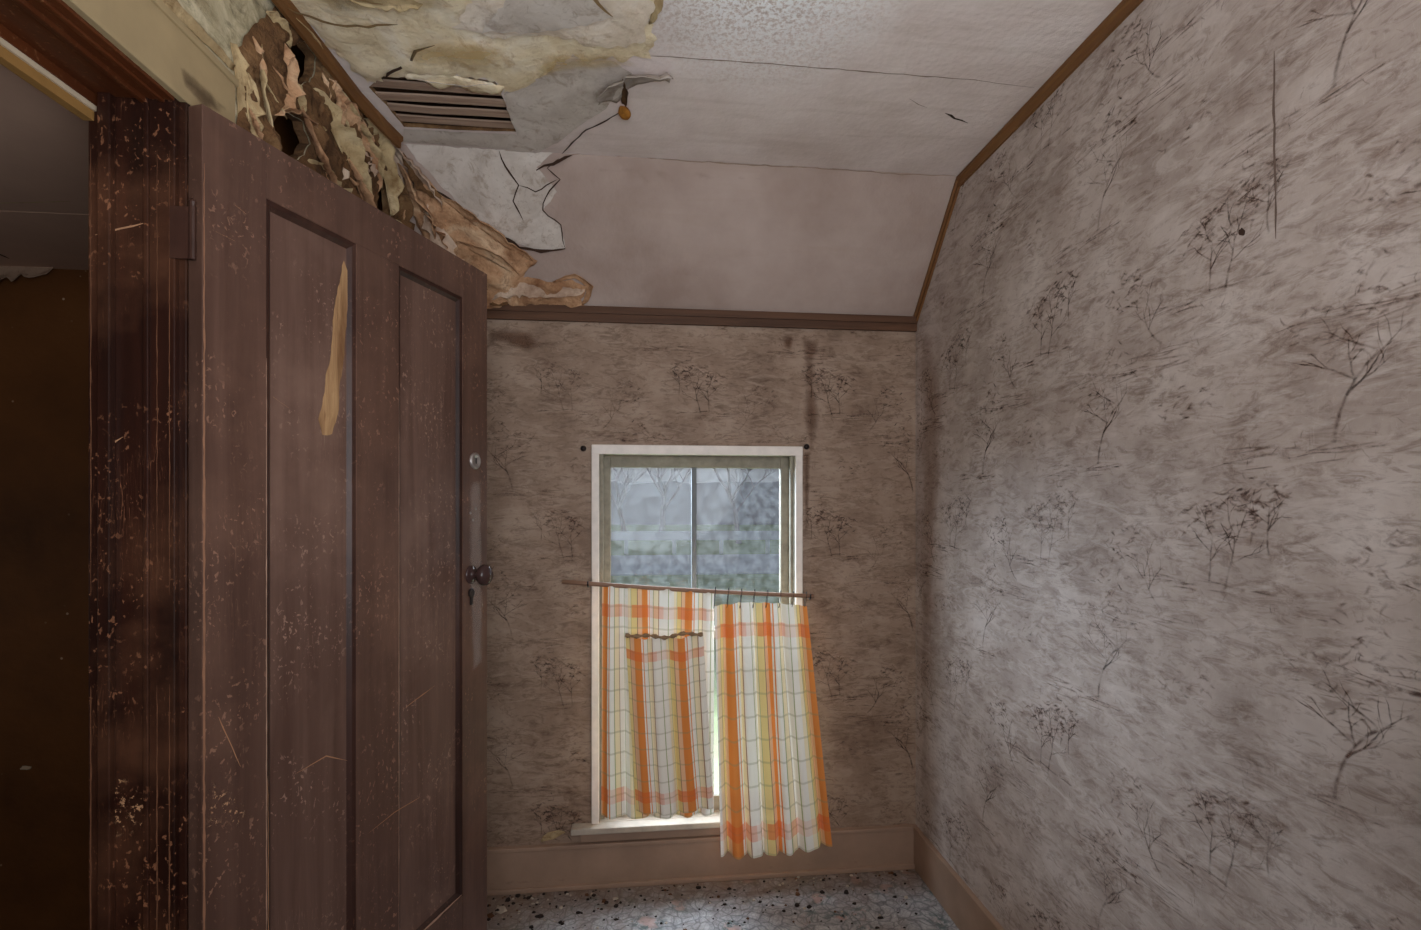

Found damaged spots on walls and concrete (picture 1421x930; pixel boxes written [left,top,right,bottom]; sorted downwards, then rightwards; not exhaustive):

spalling [162,0,673,306]
crack [656,56,1034,123]
crack [1270,52,1278,239]
peeling [0,266,54,282]